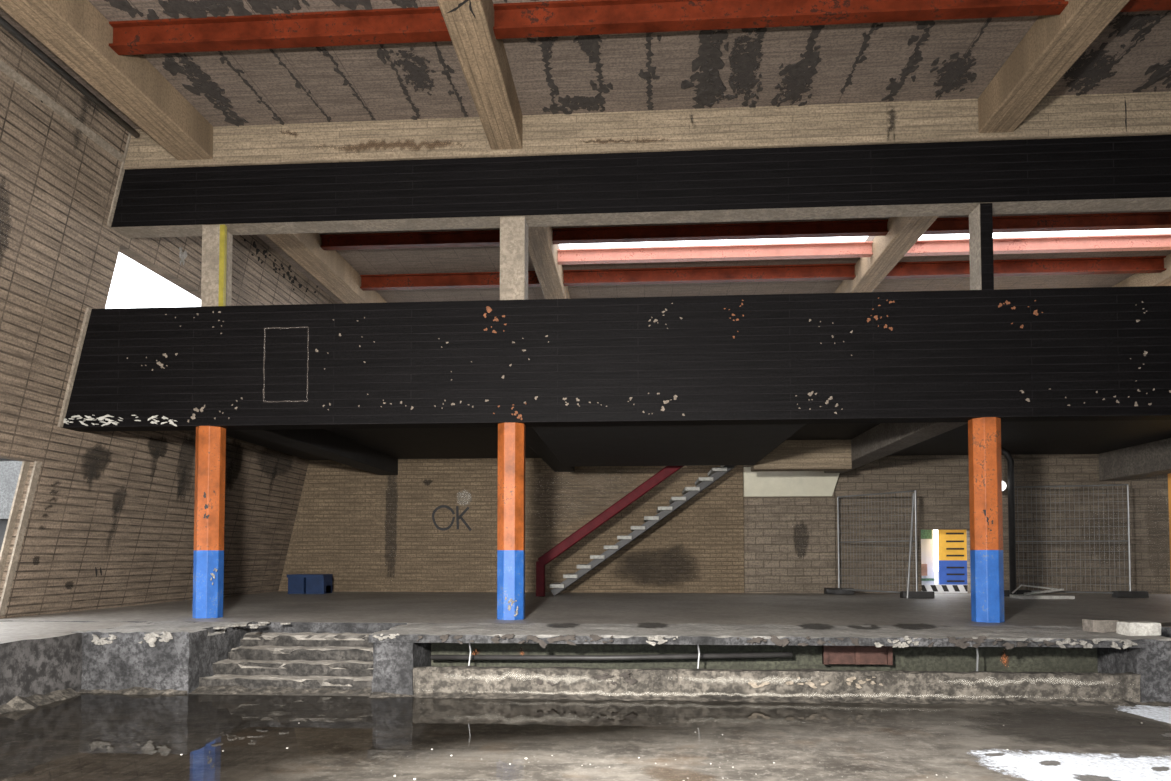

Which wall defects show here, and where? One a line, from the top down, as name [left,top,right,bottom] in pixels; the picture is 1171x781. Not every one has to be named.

water stain [0,182,9,261]
spalling [64,397,243,427]
water stain [83,446,111,486]
water stain [148,438,195,498]
water stain [386,475,397,576]